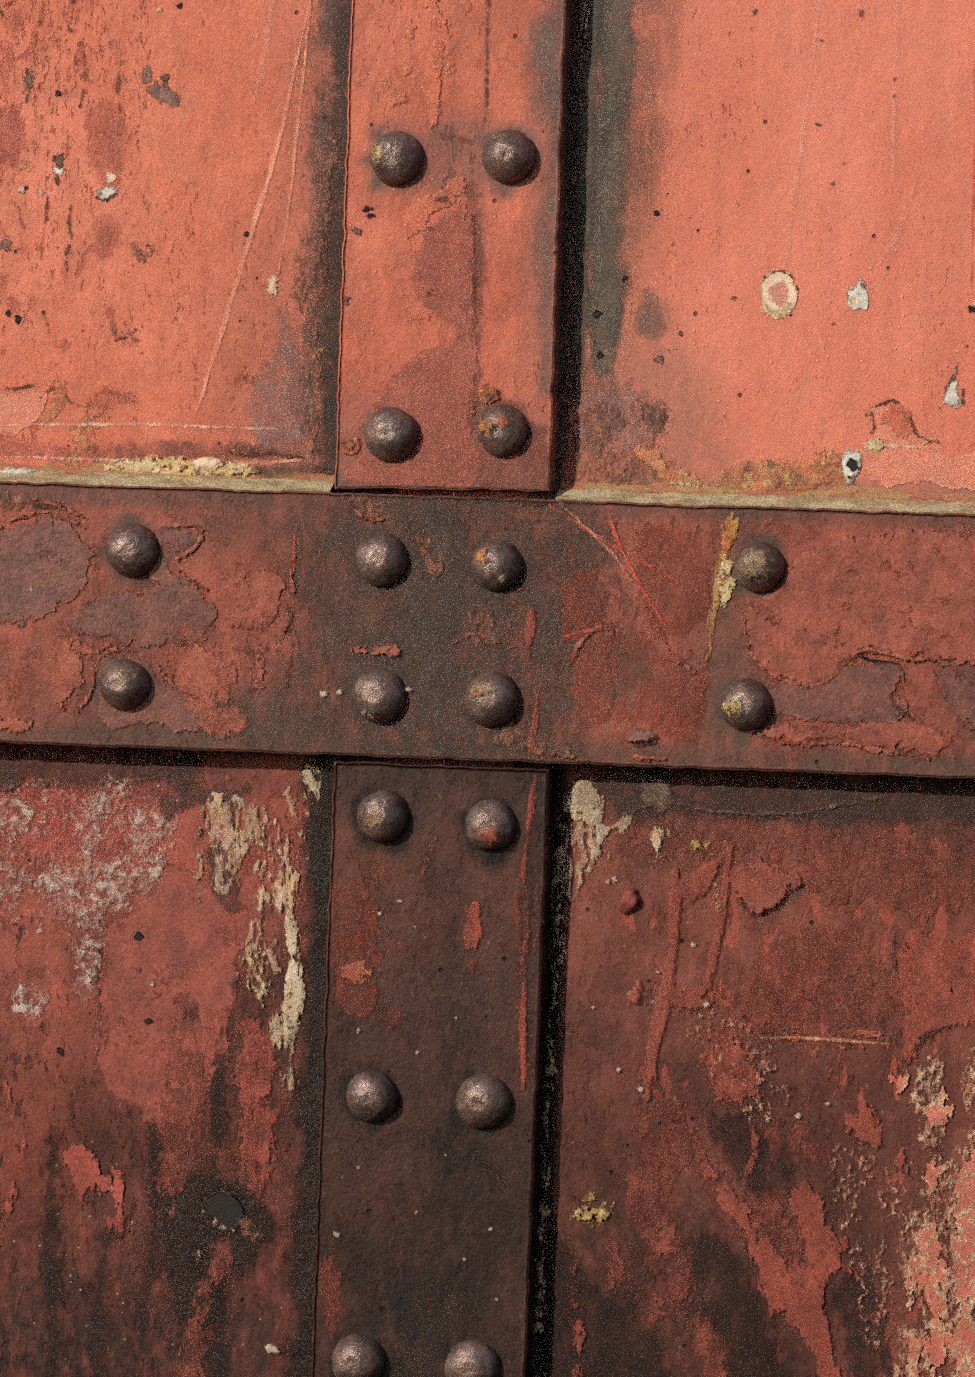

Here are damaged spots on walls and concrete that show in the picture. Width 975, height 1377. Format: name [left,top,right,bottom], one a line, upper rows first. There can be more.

water stain [587,0,665,401]
rust [557,0,840,493]
peeling [759,269,798,319]
rust [863,438,886,453]
peeling [840,399,975,490]
peeling [742,519,975,763]
peeling [16,764,249,858]
peeling [89,864,281,1377]